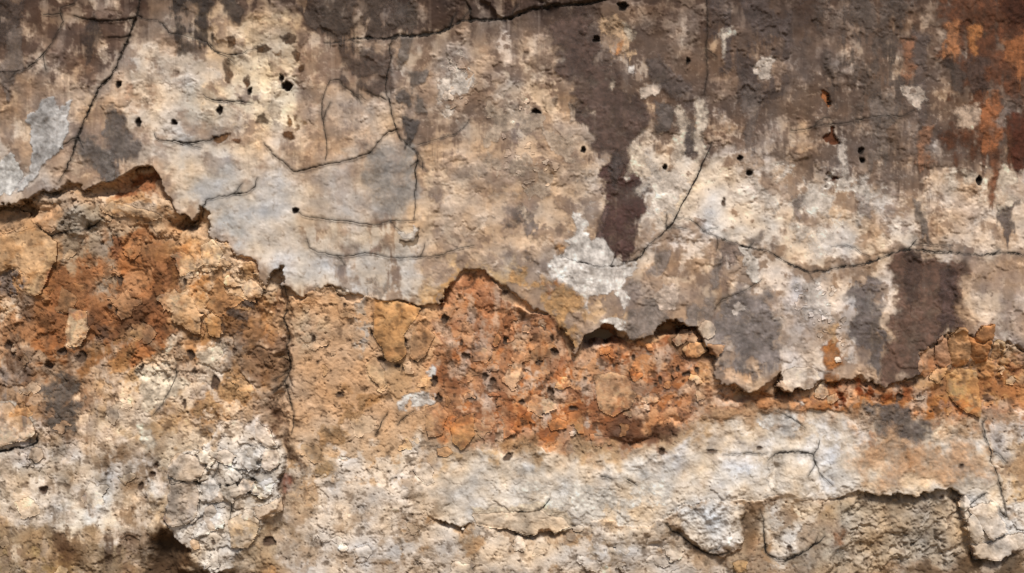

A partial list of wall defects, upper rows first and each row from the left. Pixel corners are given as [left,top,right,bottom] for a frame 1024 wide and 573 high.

leakage [79,109,141,182]
crack [0,0,262,181]
leakage [169,0,244,55]
crack [265,0,603,263]
spalling [0,175,1024,573]
corrosion [509,268,586,347]
leakage [548,7,781,380]
crack [562,143,1022,283]
leakage [847,198,971,387]
corrosion [915,0,1024,209]
crack [668,526,726,556]
crack [760,511,825,561]